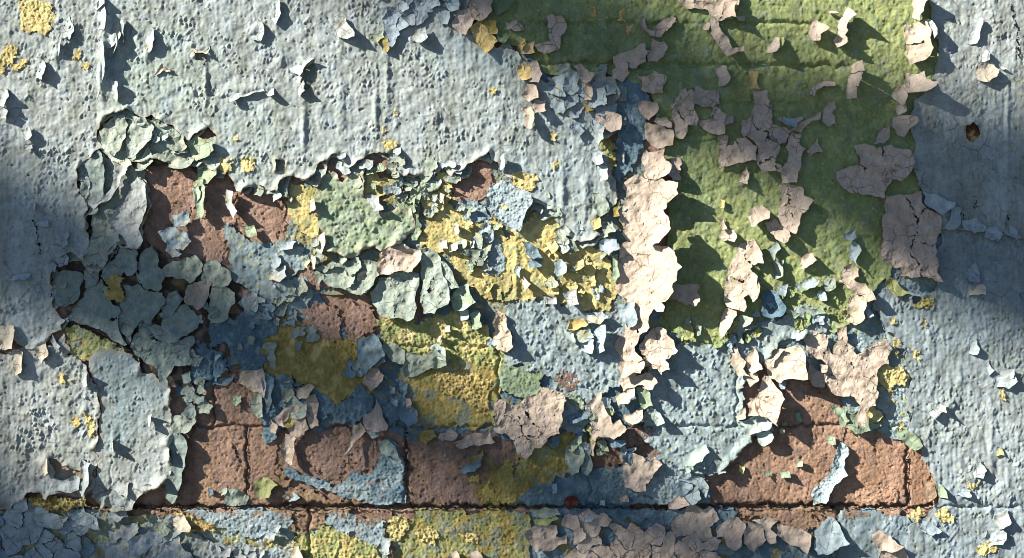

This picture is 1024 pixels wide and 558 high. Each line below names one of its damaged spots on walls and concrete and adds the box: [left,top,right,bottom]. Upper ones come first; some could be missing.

peeling [31,16,74,80]
peeling [93,0,125,102]
peeling [250,0,281,41]
peeling [678,0,745,56]
peeling [809,8,856,48]
peeling [369,0,676,181]
peeling [836,0,1018,296]
flaking render [49,65,972,558]
peeling [0,324,61,376]
peeling [968,338,1017,389]
peeling [0,459,100,558]
peeling [979,509,1011,547]